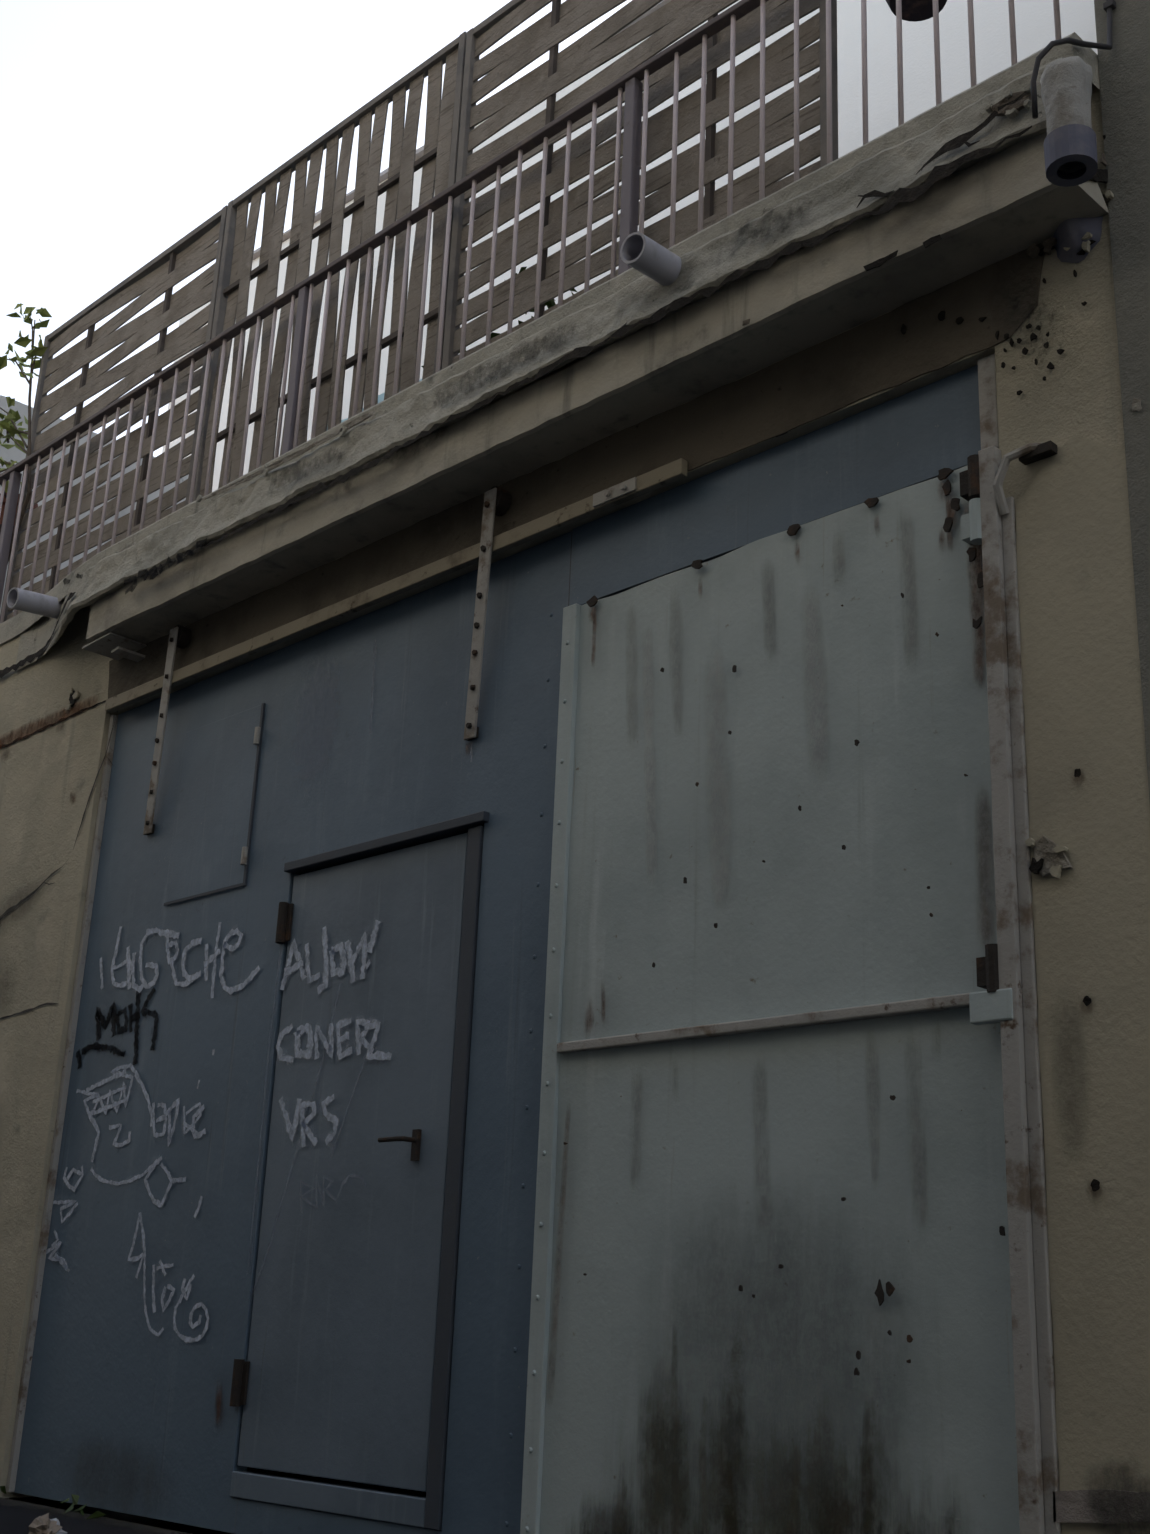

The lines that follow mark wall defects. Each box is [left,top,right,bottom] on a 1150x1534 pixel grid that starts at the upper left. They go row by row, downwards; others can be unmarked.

crack [140,92,1032,577]
corrosion [937,468,960,544]
corrosion [966,544,983,680]